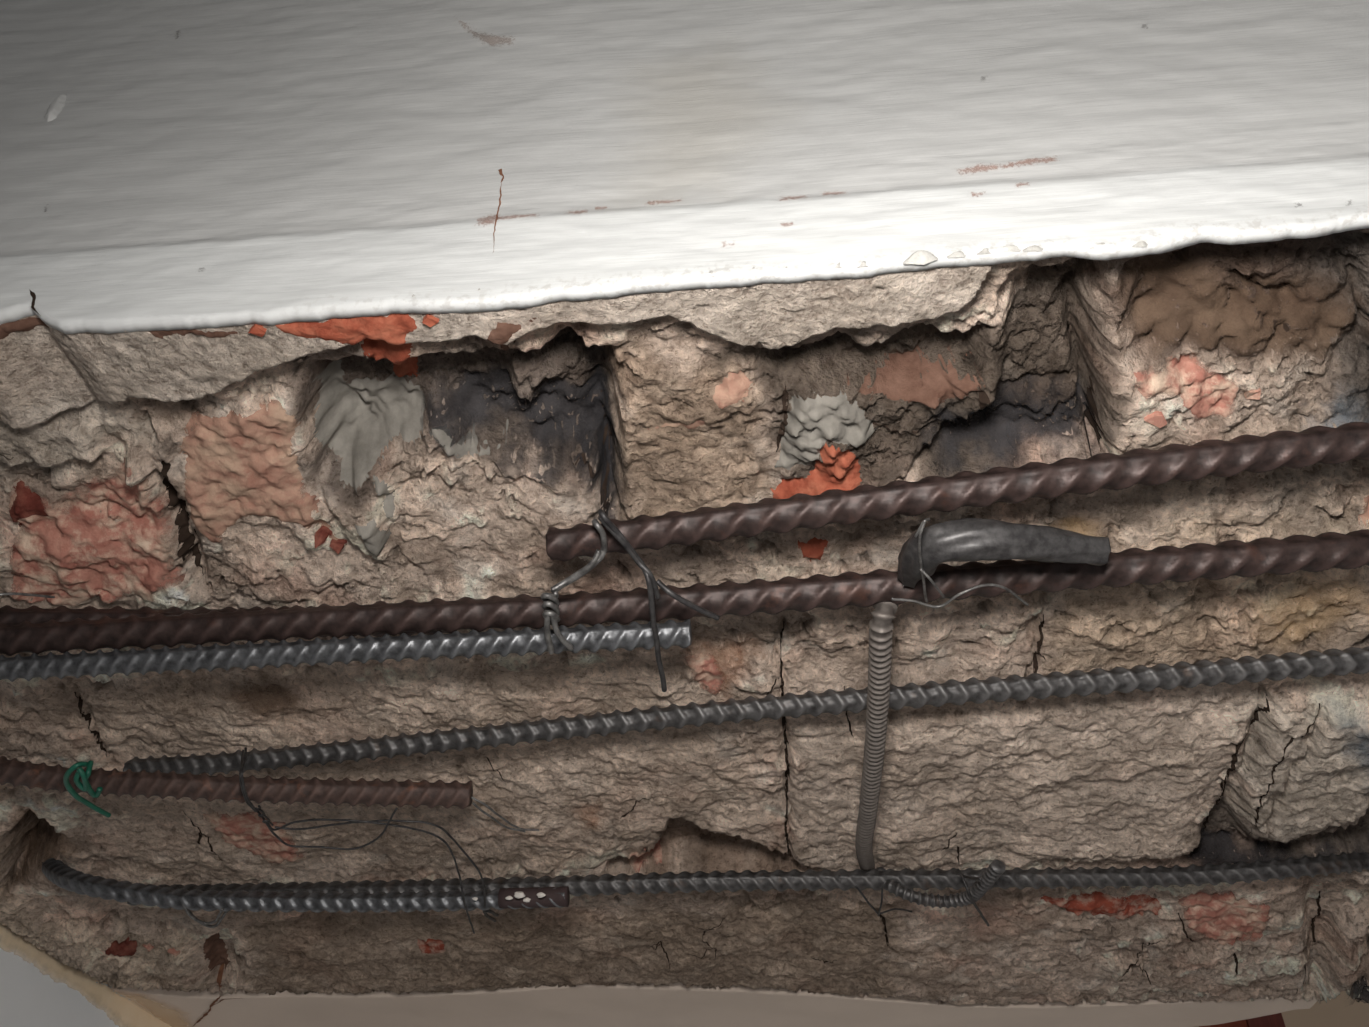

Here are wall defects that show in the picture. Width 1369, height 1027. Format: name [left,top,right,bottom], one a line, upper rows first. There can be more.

spalling [0,317,49,339]
spalling [8,457,185,606]
crack [160,460,204,575]
spalling [179,400,348,554]
spalling [149,313,439,377]
damp [427,365,617,519]
spalling [771,443,862,499]
spalling [845,344,986,409]
spalling [1133,354,1261,428]
crack [767,621,791,855]
crack [1188,694,1270,855]
crack [1249,703,1320,834]